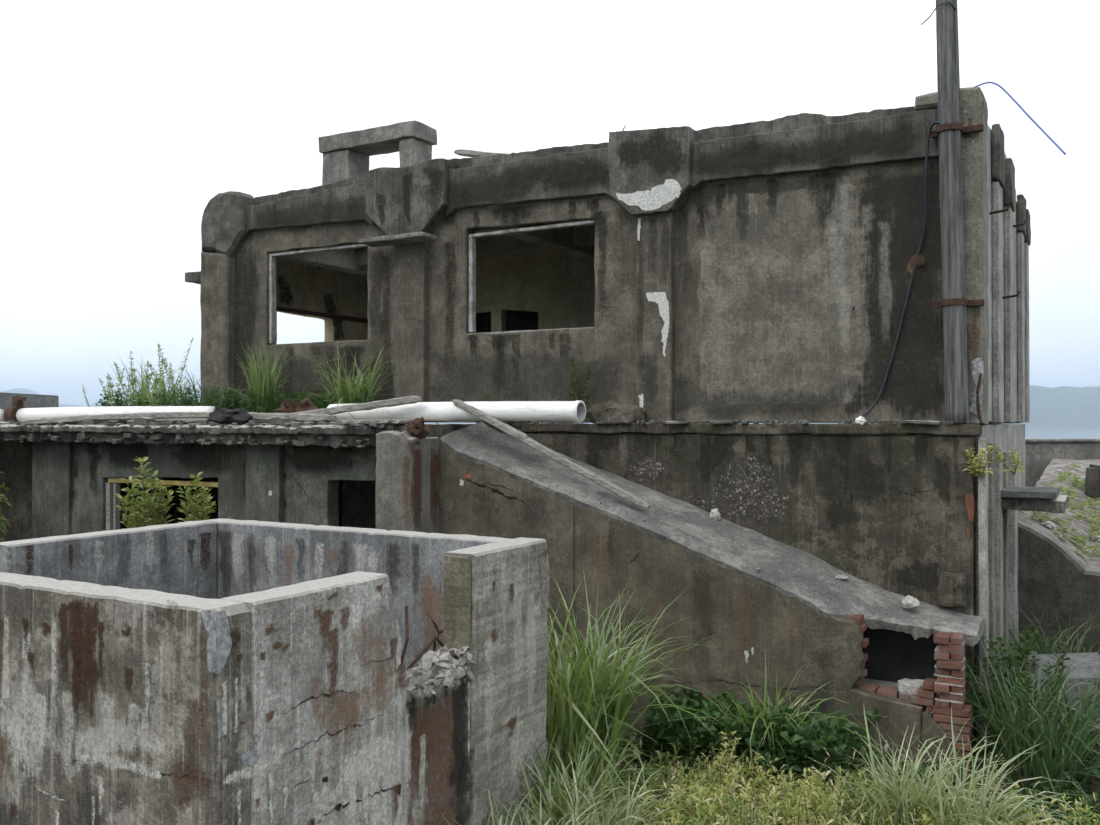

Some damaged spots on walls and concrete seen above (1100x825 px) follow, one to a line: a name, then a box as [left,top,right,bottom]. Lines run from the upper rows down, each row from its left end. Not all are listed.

leakage [424,153,609,227]
peeling [615,179,682,241]
leakage [618,120,916,338]
leakage [845,160,945,419]
peeling [646,292,670,357]
rust [42,599,104,718]
spalling [201,610,243,674]
crack [281,658,392,714]
rust [390,638,405,687]
crack [285,712,389,756]
rust [393,690,467,825]
crack [307,788,394,825]